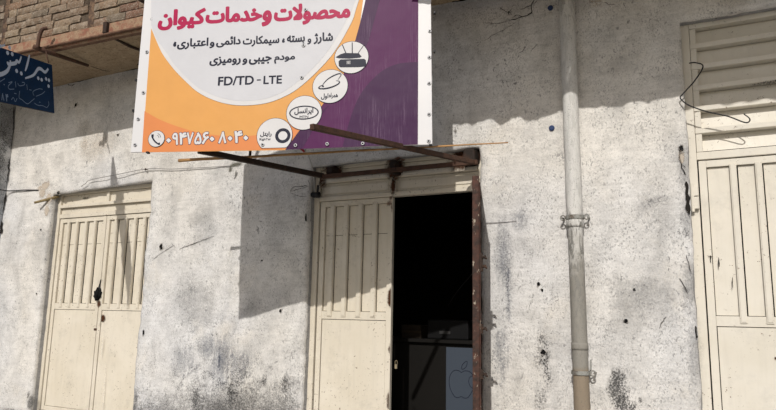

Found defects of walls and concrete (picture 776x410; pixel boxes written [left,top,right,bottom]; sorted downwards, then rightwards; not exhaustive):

crack [488,0,537,39]
water stain [608,369,642,410]